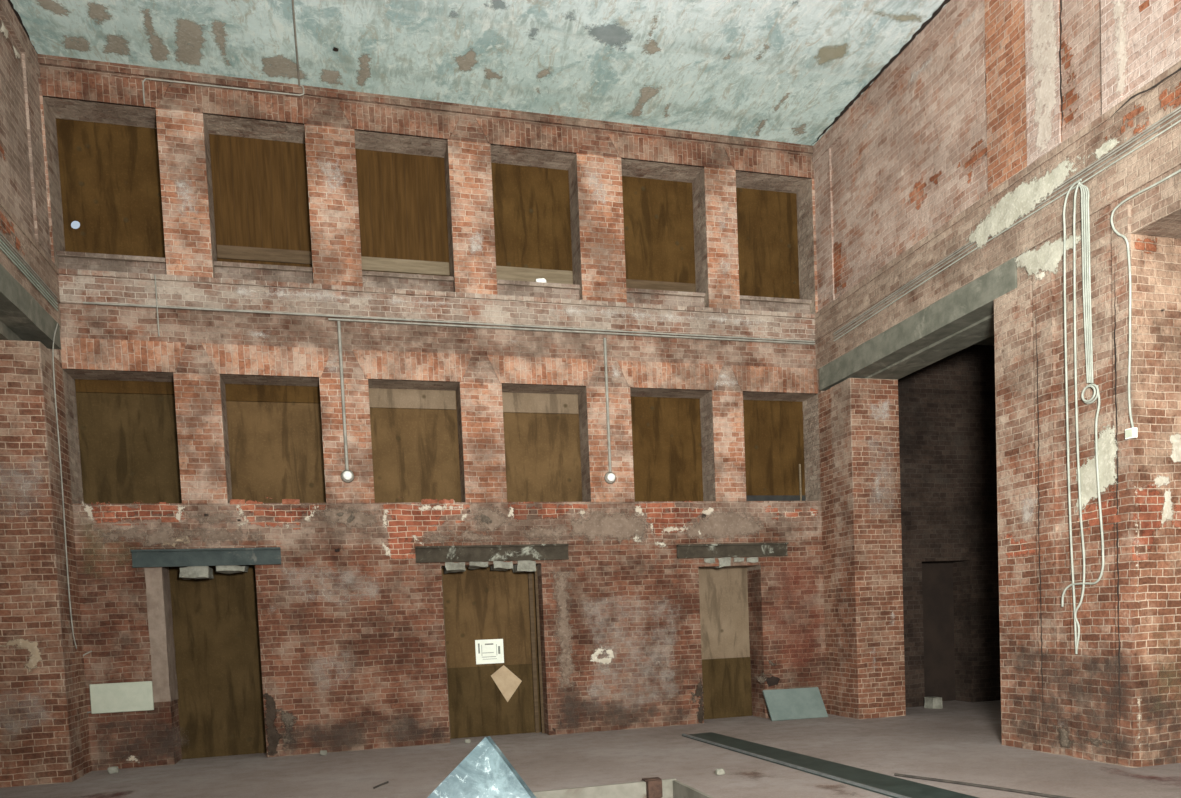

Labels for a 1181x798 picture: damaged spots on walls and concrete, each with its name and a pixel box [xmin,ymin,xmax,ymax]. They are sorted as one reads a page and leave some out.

peeling [37,0,70,16]
peeling [63,3,130,55]
peeling [142,9,230,66]
peeling [262,55,306,79]
peeling [321,69,343,85]
peeling [356,54,371,86]
flaking render [230,497,590,559]